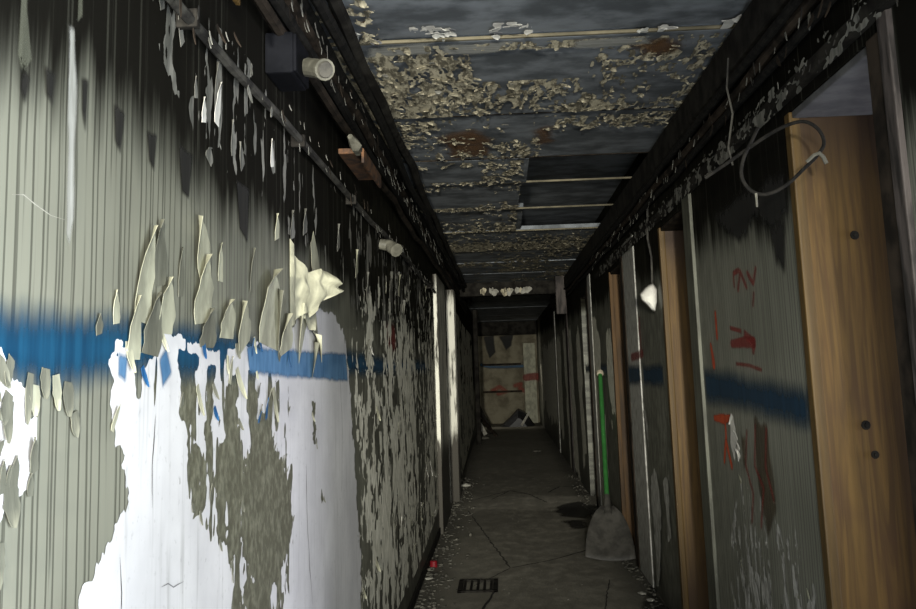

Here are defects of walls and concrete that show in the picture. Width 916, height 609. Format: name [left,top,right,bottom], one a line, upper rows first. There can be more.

peeling [159,0,185,97]
peeling [334,0,742,253]
peeling [78,29,439,609]
peeling [480,286,532,296]
crack [468,486,585,609]